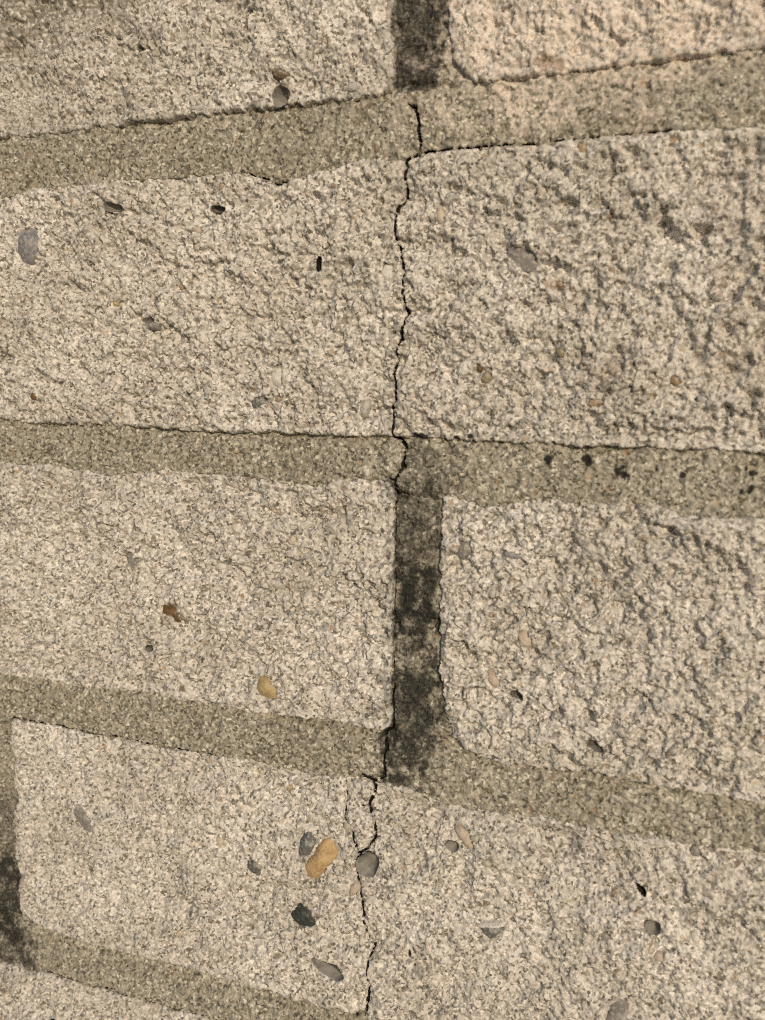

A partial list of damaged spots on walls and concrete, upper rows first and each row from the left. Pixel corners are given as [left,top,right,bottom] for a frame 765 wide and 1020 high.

damp [390,0,448,92]
crack [390,104,672,612]
damp [387,477,442,648]
damp [380,663,444,792]
damp [0,853,35,969]
crack [345,659,396,1015]